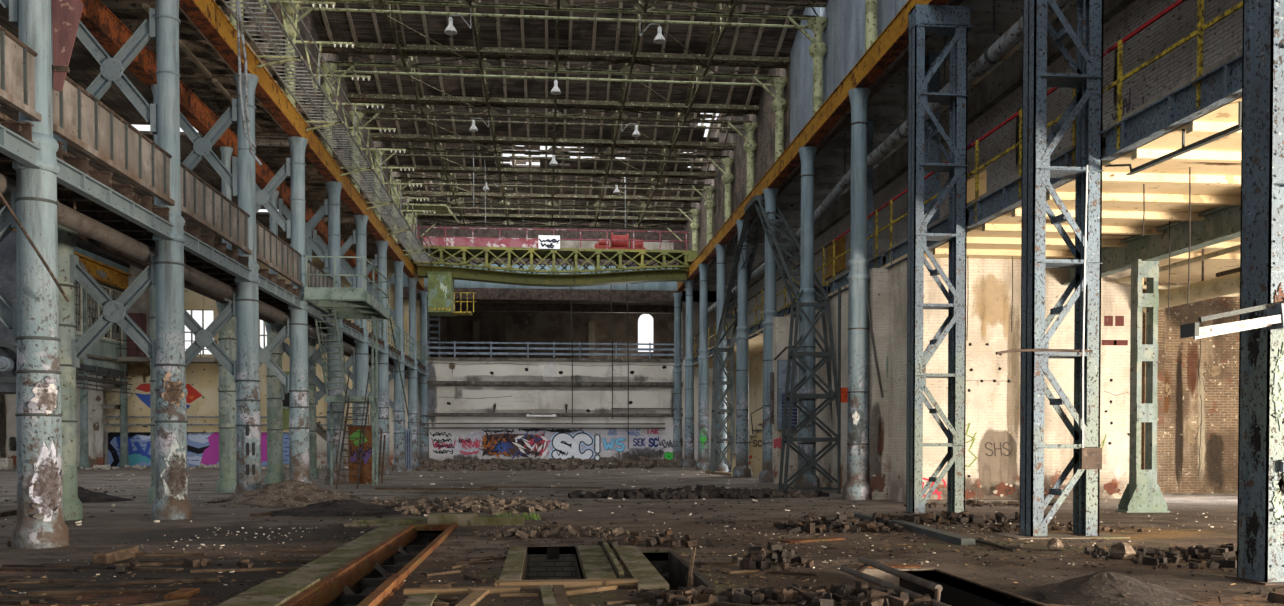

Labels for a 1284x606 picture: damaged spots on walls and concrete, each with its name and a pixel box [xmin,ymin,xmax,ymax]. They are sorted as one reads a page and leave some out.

corrosion [164,381,182,404]
water stain [965,277,1020,499]
water stain [1175,352,1223,488]
peeling [8,436,63,522]
corrosion [168,454,186,500]
water stain [1044,478,1073,499]